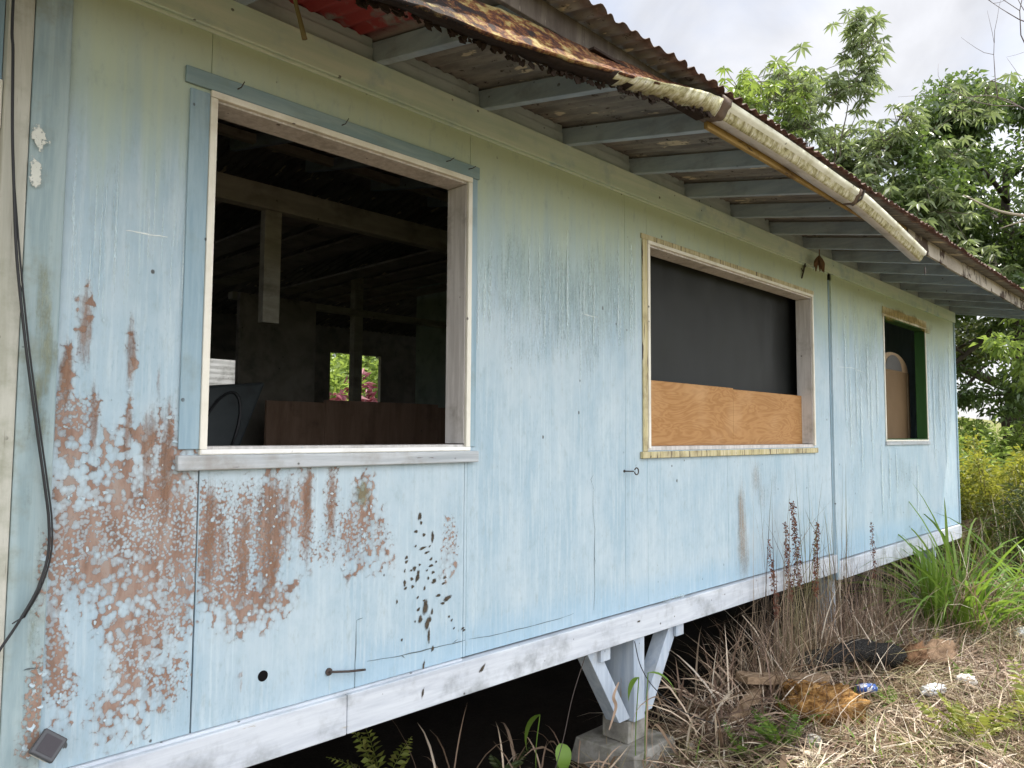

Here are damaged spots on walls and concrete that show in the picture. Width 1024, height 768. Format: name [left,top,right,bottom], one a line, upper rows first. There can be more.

rust [370,0,724,117]
peeling [29,124,51,187]
peeling [14,282,395,759]
peeling [441,516,459,582]